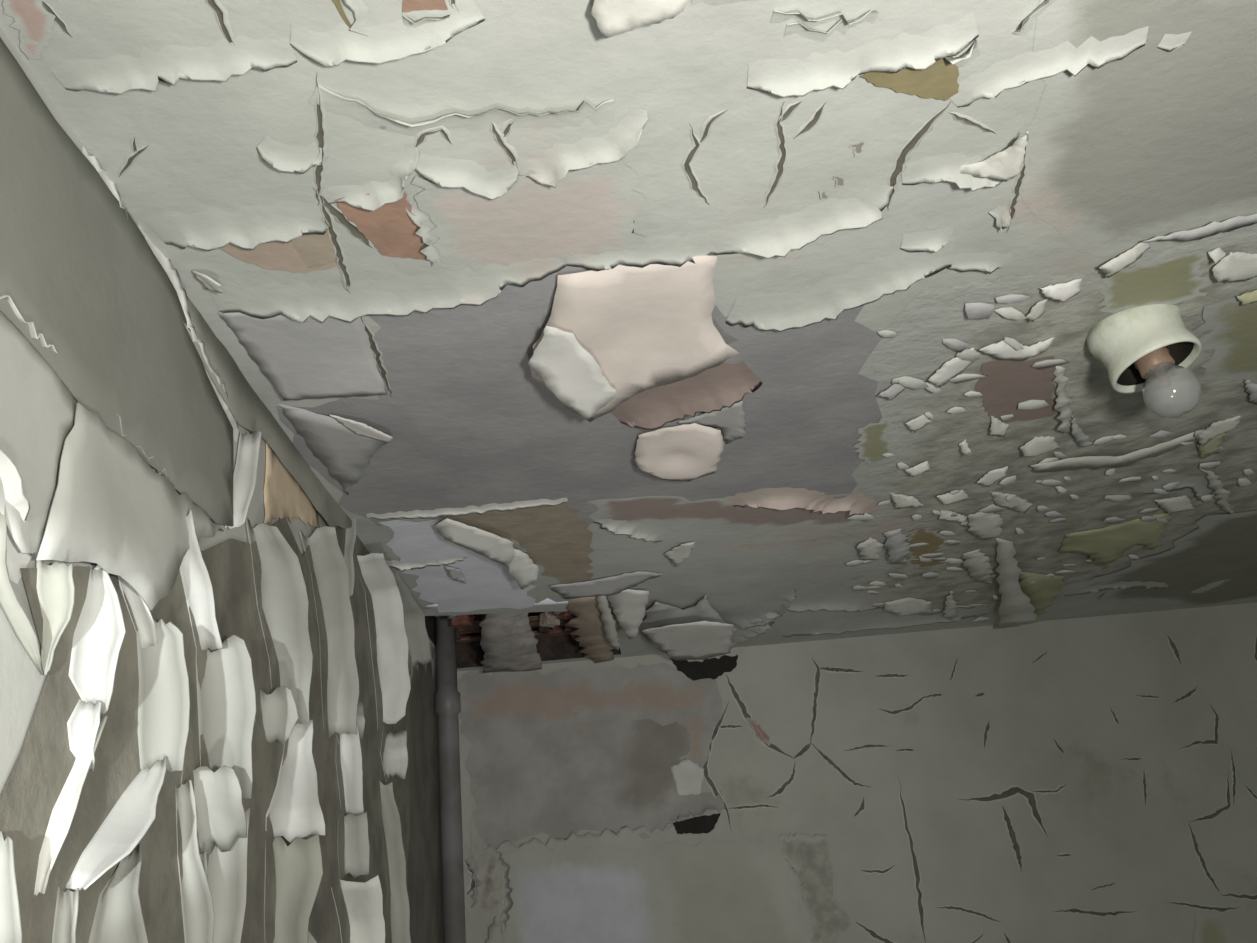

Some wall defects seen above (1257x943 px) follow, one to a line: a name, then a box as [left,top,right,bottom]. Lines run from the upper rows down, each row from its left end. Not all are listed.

peeling [48,0,485,95]
spalling [142,199,338,274]
spalling [184,0,1257,738]
peeling [0,37,299,943]
spalling [245,442,411,943]
spalling [459,734,662,943]
spalling [670,759,725,834]
crack [703,657,1011,943]
crack [957,739,1071,873]
crack [1053,635,1257,917]
crack [1249,628,1257,663]